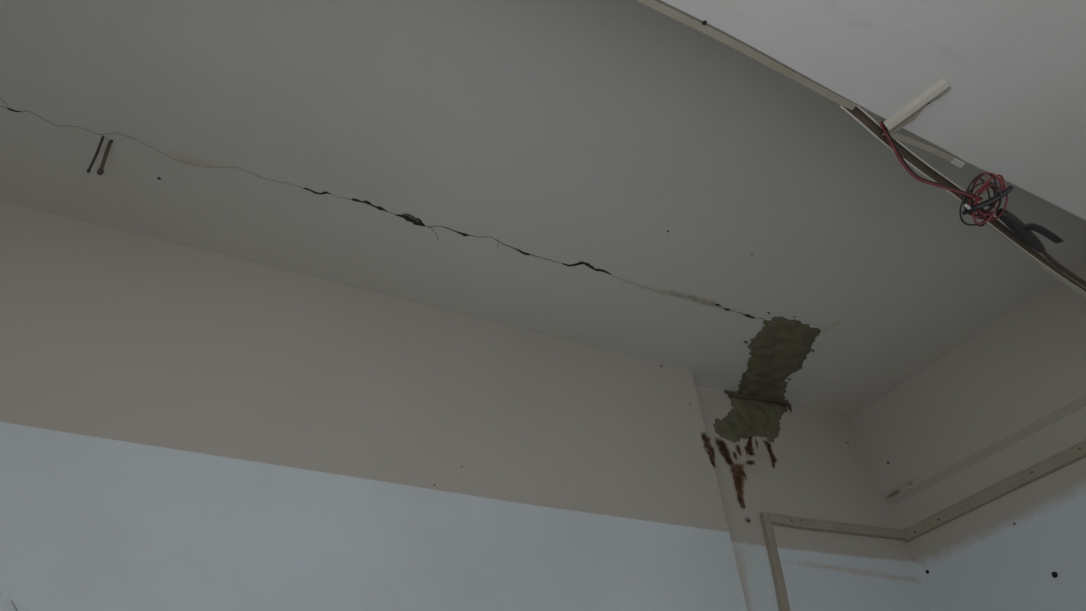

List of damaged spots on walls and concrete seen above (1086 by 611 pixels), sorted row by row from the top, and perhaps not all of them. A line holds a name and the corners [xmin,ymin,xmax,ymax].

crack [0,99,765,319]
rust [702,434,780,522]